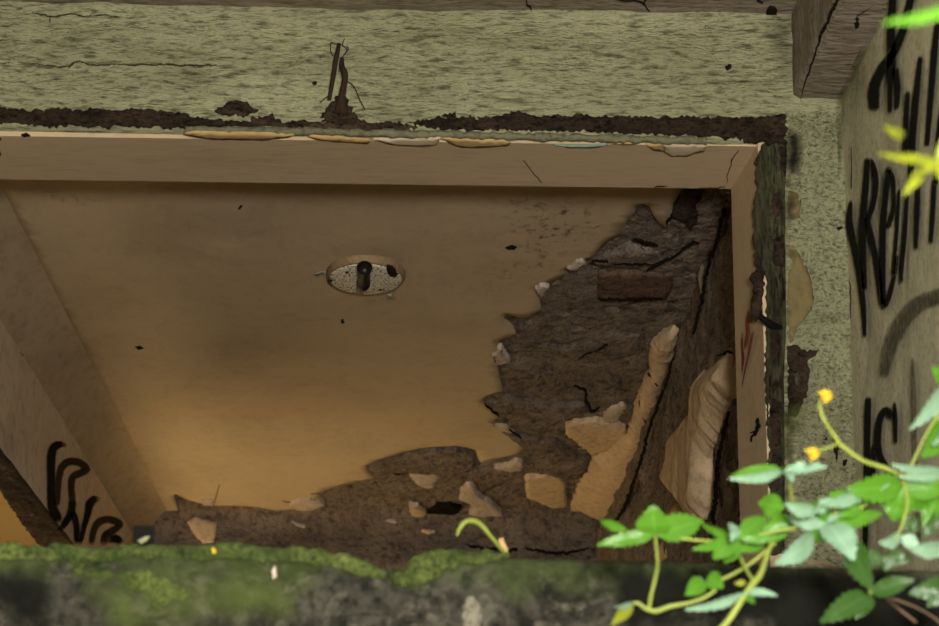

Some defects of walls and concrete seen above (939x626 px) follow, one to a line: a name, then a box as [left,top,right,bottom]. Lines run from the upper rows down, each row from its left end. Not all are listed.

crack [800,0,871,99]
spalling [290,189,732,528]
spalling [0,457,64,548]
spalling [174,494,260,554]
damp [0,579,44,620]
damp [615,569,690,626]
damp [702,567,939,626]